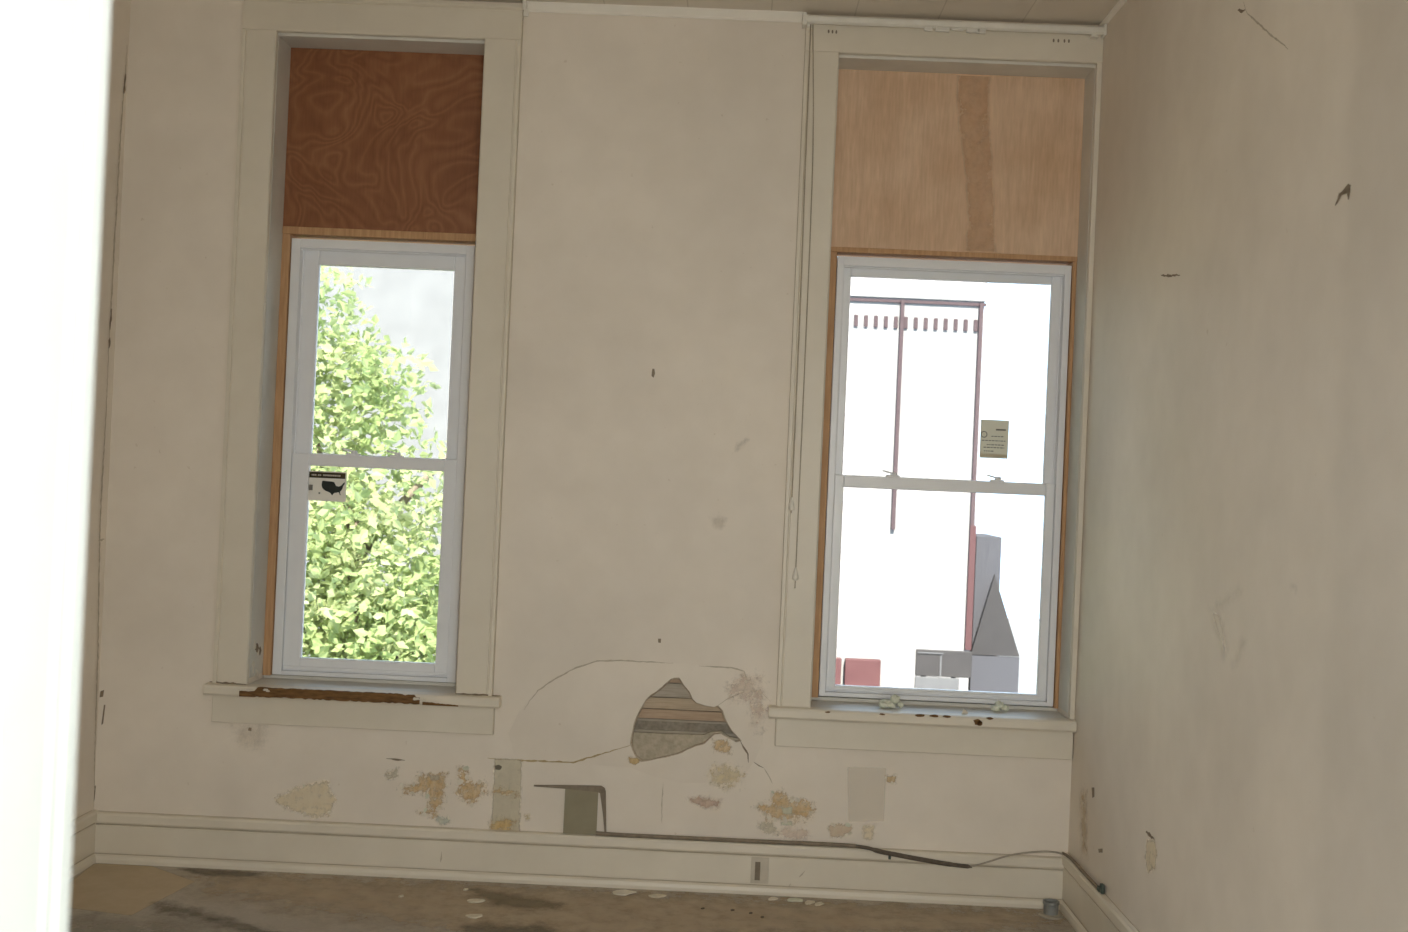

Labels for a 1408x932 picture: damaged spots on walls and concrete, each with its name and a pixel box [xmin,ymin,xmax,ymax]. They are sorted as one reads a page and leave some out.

peeling [238,641,458,707]
crack [524,660,664,710]
crack [705,666,770,705]
spalling [630,678,741,762]
crack [740,741,772,783]
peeling [400,766,485,819]
peeling [755,791,814,837]